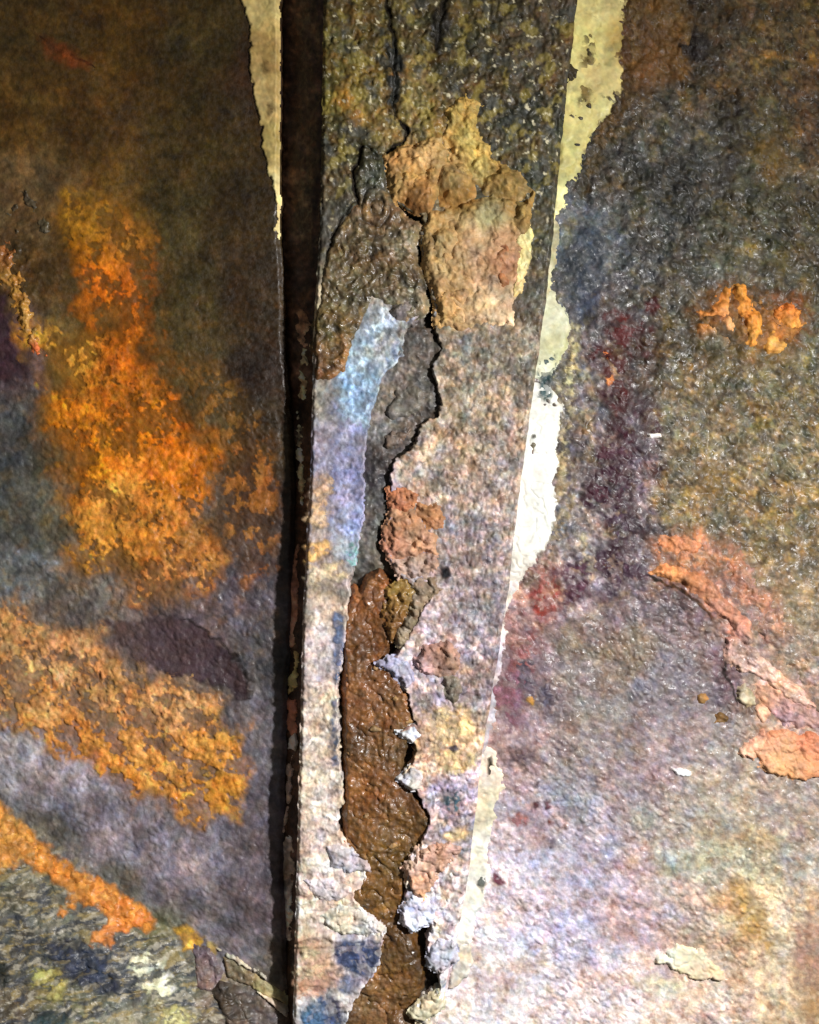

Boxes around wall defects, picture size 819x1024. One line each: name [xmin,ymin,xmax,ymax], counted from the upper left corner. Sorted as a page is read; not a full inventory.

peeling [241,0,282,240]
crack [327,106,411,252]
rust [0,190,277,606]
crack [350,215,442,588]
peeling [282,0,628,1024]
rust [686,283,807,365]
rust [0,601,246,827]
crack [337,673,345,750]
crack [405,743,413,762]
spalling [648,531,819,781]
rust [0,801,156,993]
crack [416,927,439,992]